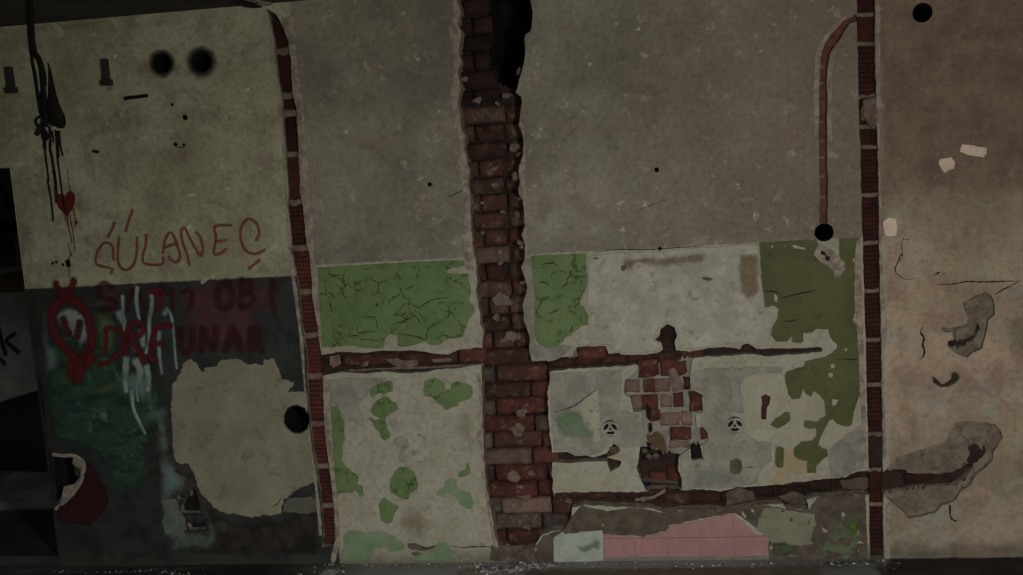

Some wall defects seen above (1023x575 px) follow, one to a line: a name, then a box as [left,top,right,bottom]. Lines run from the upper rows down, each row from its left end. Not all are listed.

peeling [317,260,475,349]
peeling [423,378,473,410]
flaking render [531,223,865,491]
flaking render [52,453,86,510]
flaking render [156,358,318,549]
peeling [331,405,364,497]
peeling [341,380,456,561]
peeling [436,463,474,509]
flaking render [490,508,718,562]
flaking render [730,495,868,560]
flaking render [884,421,1003,522]